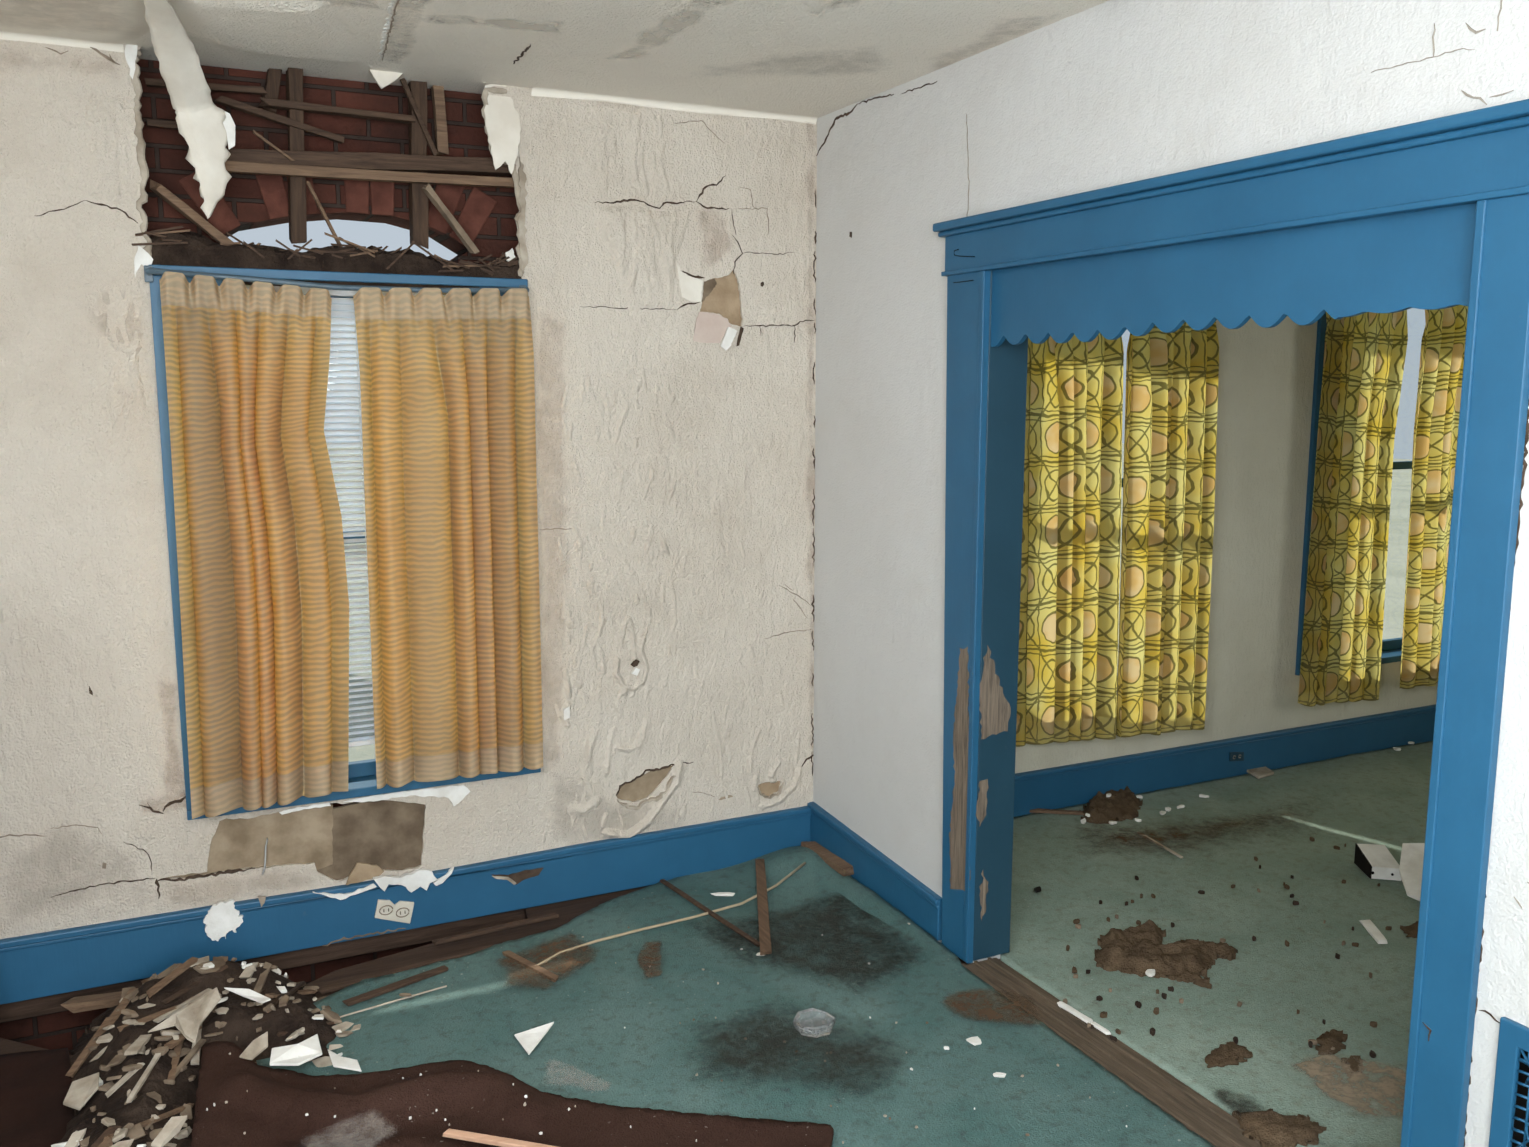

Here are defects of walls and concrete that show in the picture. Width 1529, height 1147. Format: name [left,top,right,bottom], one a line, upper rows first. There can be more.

peeling [125,0,235,277]
flaking render [369,70,403,89]
flaking render [480,82,528,277]
crack [513,44,531,64]
crack [1371,0,1503,73]
crack [1461,90,1514,105]
flaking render [676,262,744,351]
crack [580,81,937,776]
crack [0,824,160,899]
crack [140,796,186,814]
flaking render [157,785,471,900]
peeling [949,645,1011,920]